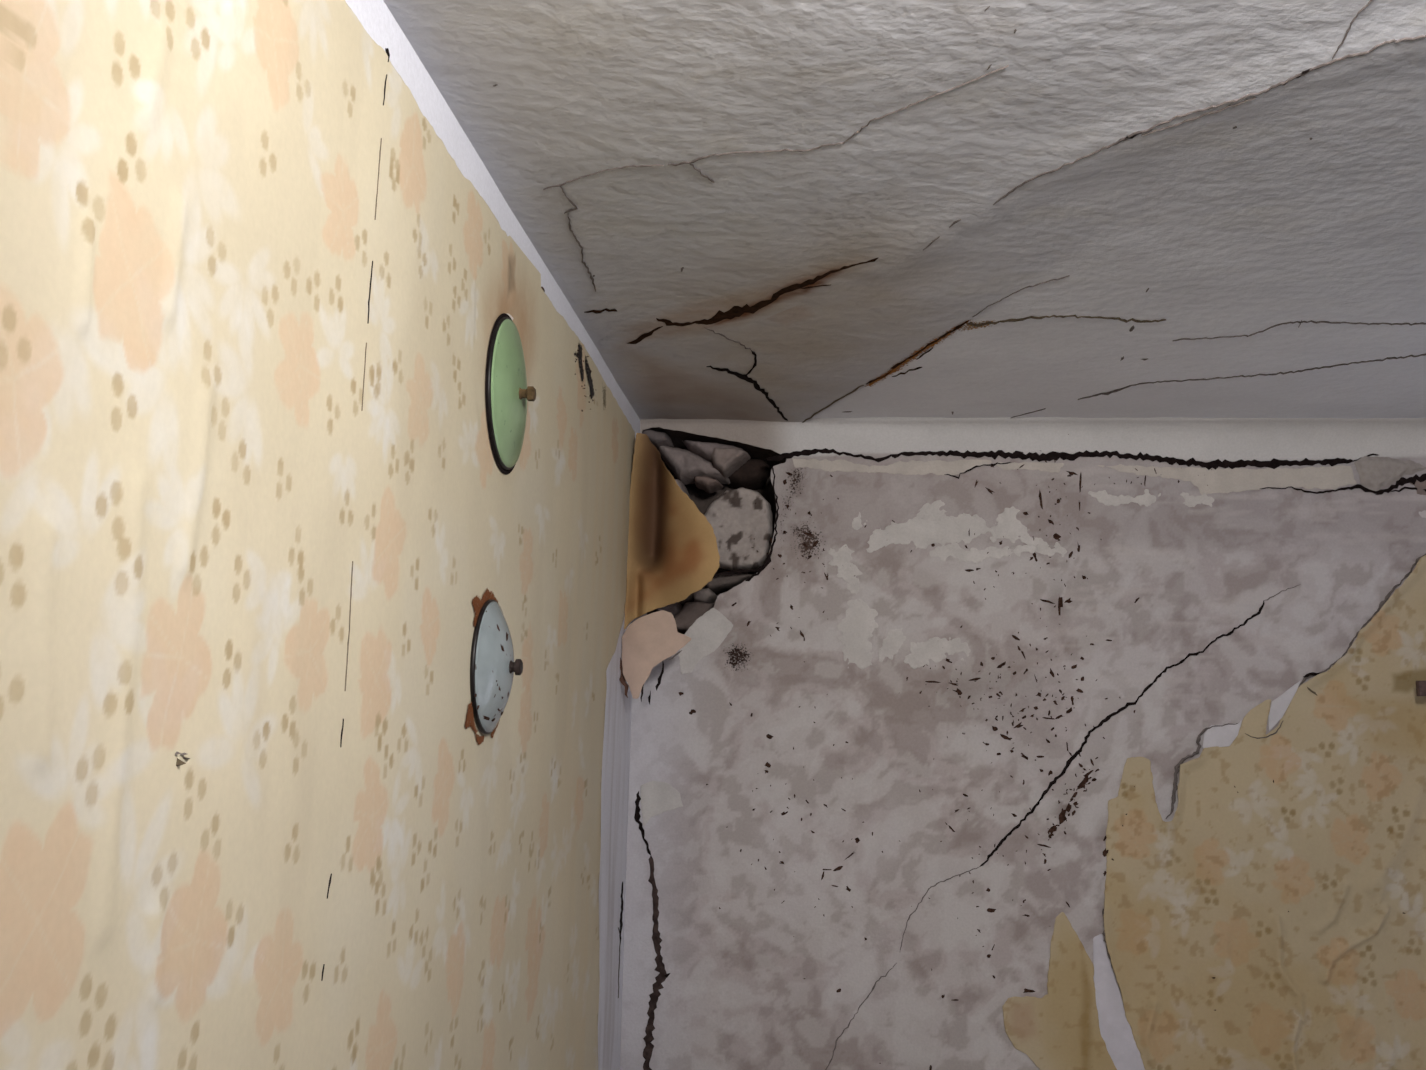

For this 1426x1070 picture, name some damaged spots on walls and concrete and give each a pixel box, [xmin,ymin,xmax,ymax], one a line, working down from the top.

crack [993,0,1426,205]
water stain [566,174,1046,422]
crack [544,65,1426,494]
spalling [642,427,1067,674]
peeling [1088,456,1426,518]
crack [618,791,670,1070]
crack [825,584,1301,1070]